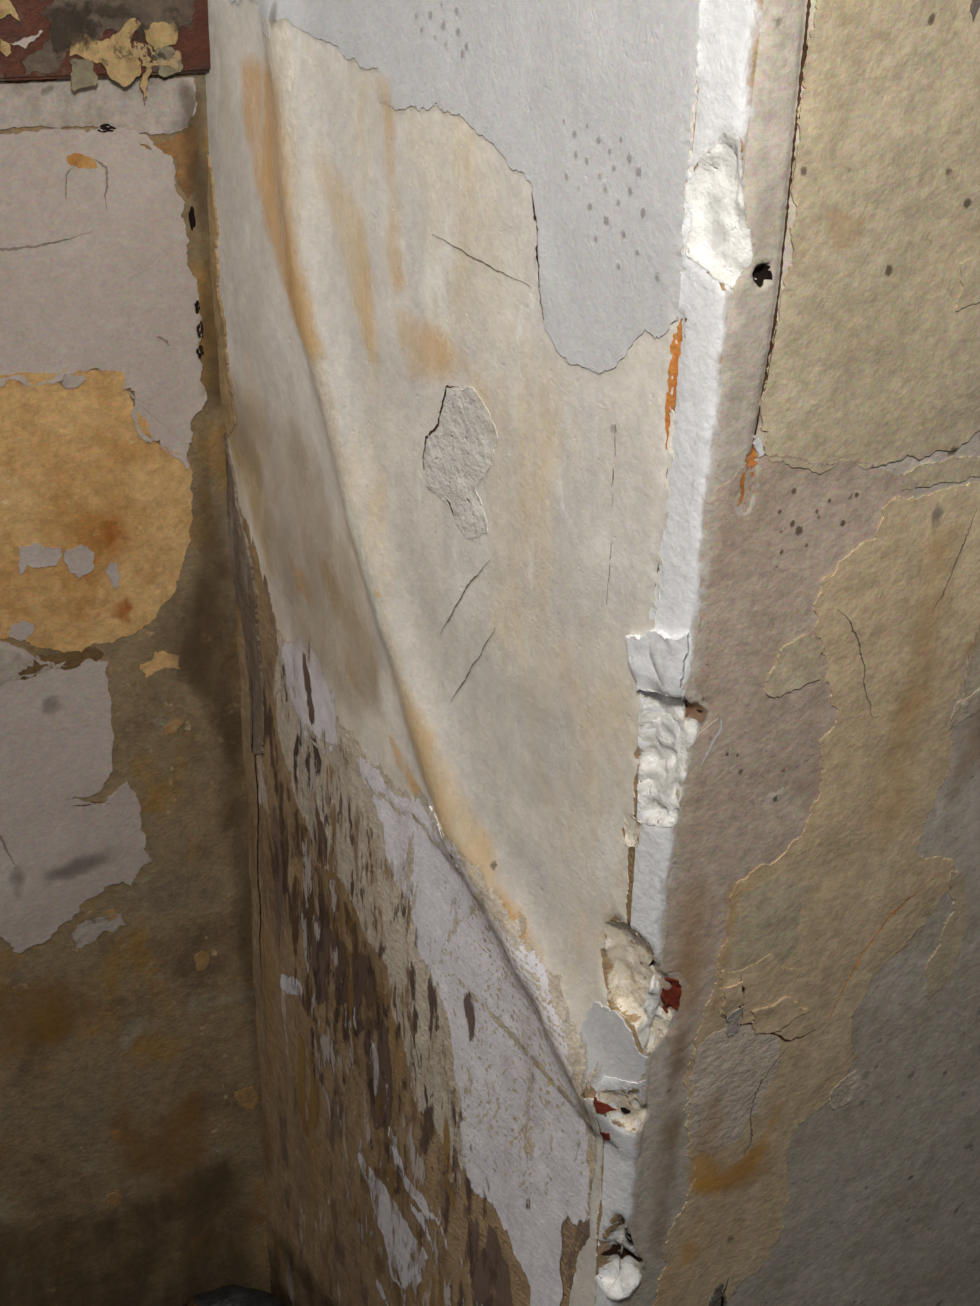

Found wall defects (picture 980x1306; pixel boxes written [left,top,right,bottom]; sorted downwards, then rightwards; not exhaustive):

peeling [0,0,207,953]
leakage [261,74,314,353]
leakage [262,500,512,1306]
peeling [205,0,980,1306]